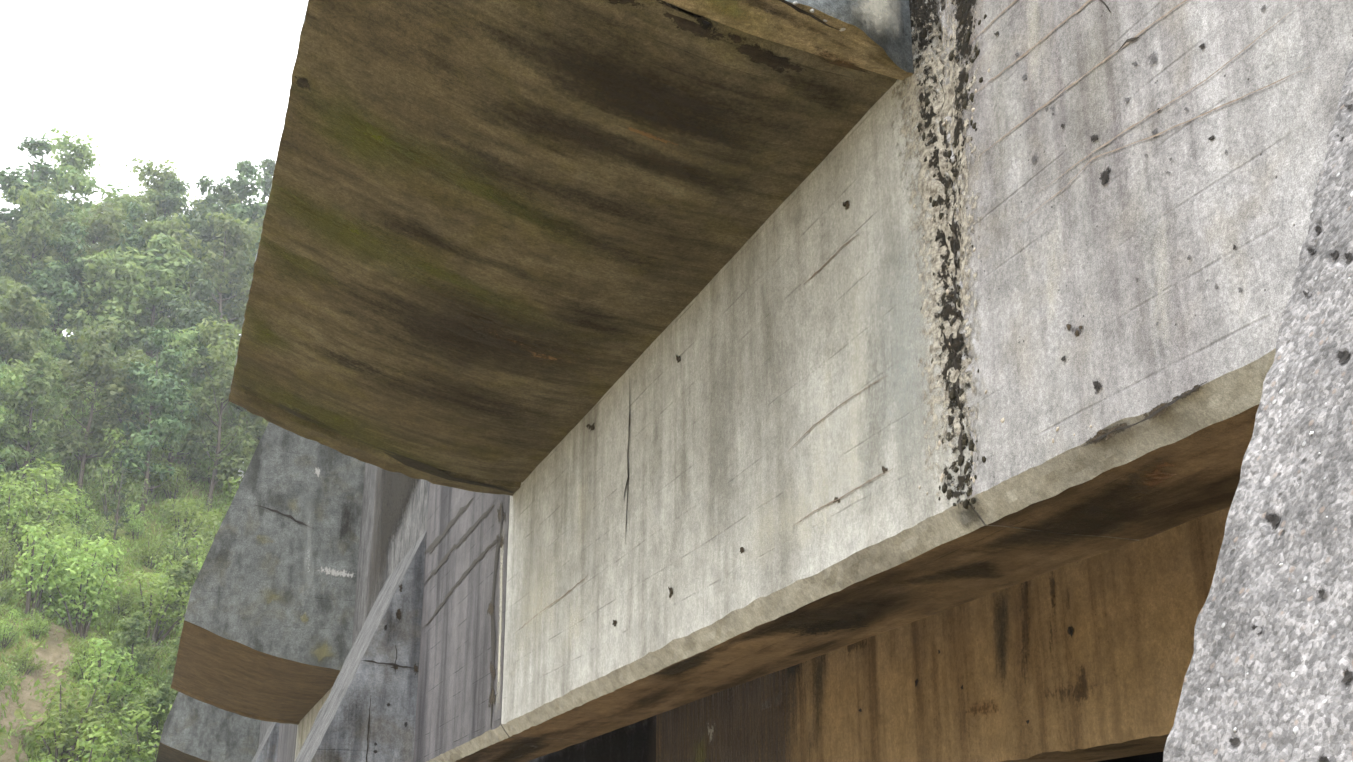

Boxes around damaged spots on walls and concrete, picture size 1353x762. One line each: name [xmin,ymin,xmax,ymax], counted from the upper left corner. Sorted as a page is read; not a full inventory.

damp [534,32,773,201]
crack [256,505,314,529]
crack [623,376,631,540]